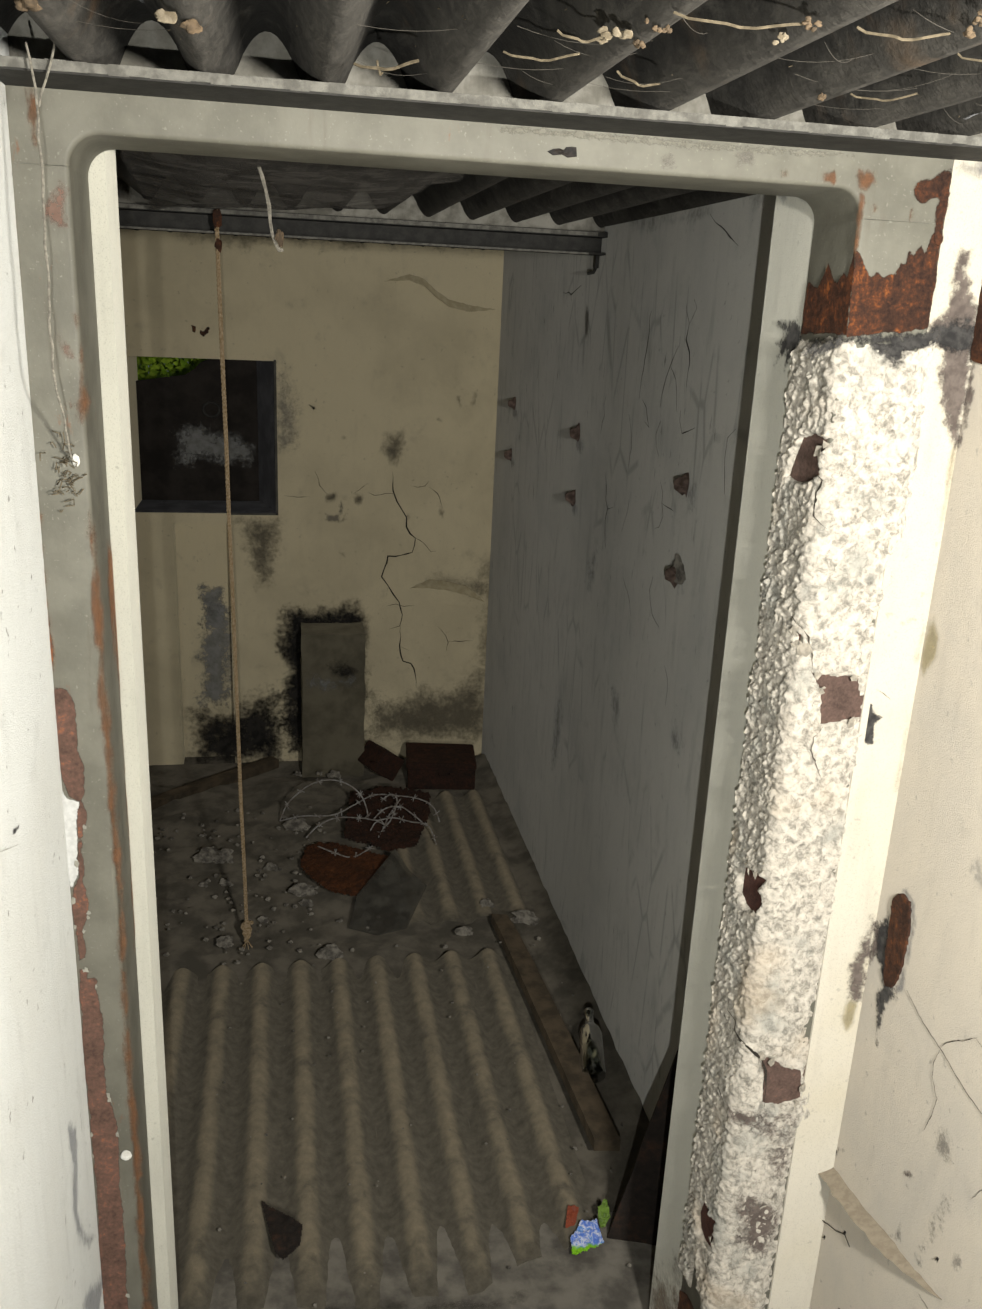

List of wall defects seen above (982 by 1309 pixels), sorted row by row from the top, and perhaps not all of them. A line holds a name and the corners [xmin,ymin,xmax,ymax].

corrosion [801,169,952,337]
spalling [782,434,831,482]
crack [358,481,441,678]
corrosion [92,553,133,896]
spalling [812,672,864,728]
spalling [742,868,766,919]
spalling [758,1052,806,1107]
crack [907,991,982,1131]
corrosion [125,1033,153,1309]
spalling [694,1201,715,1253]
corrosion [678,1290,694,1309]